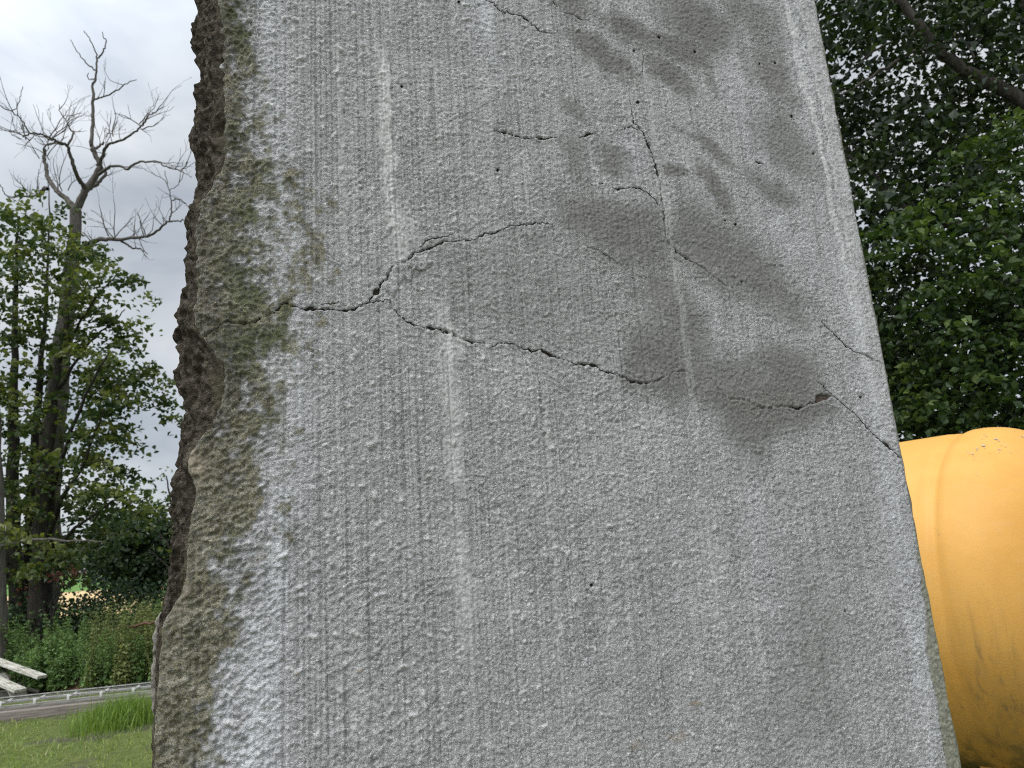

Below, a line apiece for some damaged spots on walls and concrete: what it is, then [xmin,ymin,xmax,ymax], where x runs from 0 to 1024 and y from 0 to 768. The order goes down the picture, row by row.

crack [496,130,594,140]
crack [599,109,723,283]
spalling [151,0,227,768]
crack [209,222,723,393]
crack [754,383,900,458]
crack [821,321,886,370]